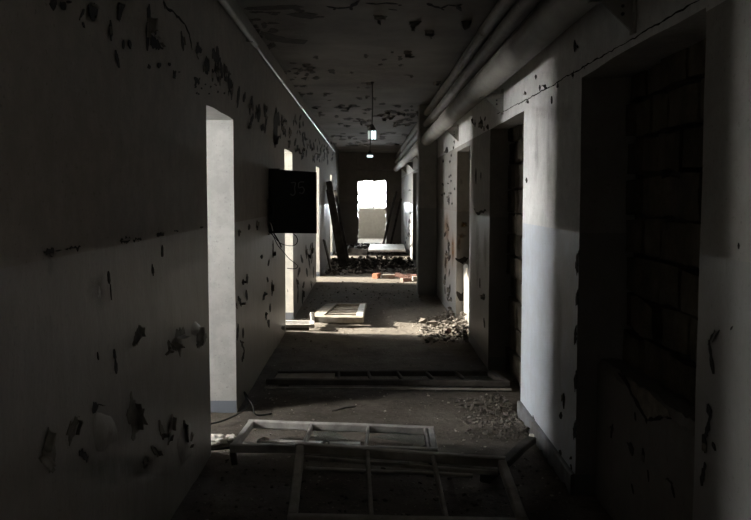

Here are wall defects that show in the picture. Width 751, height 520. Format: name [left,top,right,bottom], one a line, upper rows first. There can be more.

crack [497,0,699,114]
peeling [194,42,418,165]
peeling [296,242,314,304]
peeling [443,224,468,302]
peeling [263,277,274,328]
peeling [132,325,146,347]
peeling [165,327,207,357]
peeling [126,391,148,441]
peeling [143,414,194,468]